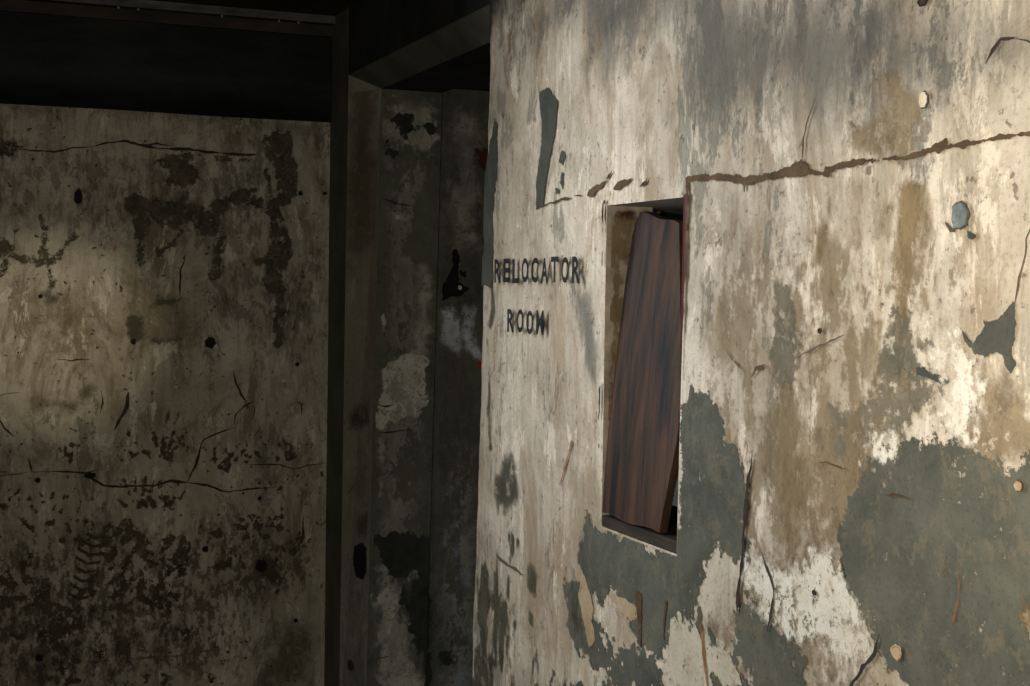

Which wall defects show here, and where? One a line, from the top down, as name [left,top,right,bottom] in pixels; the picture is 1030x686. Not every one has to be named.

crack [986,37,1030,62]
crack [685,100,1030,193]
crack [540,172,647,207]
crack [1014,229,1030,304]
damp [126,316,176,343]
peeling [962,301,1016,373]
peeling [916,367,948,387]
crack [0,371,323,493]
peeling [562,384,808,686]
peeling [836,426,1030,686]
peeling [472,532,519,686]
crack [849,634,879,686]